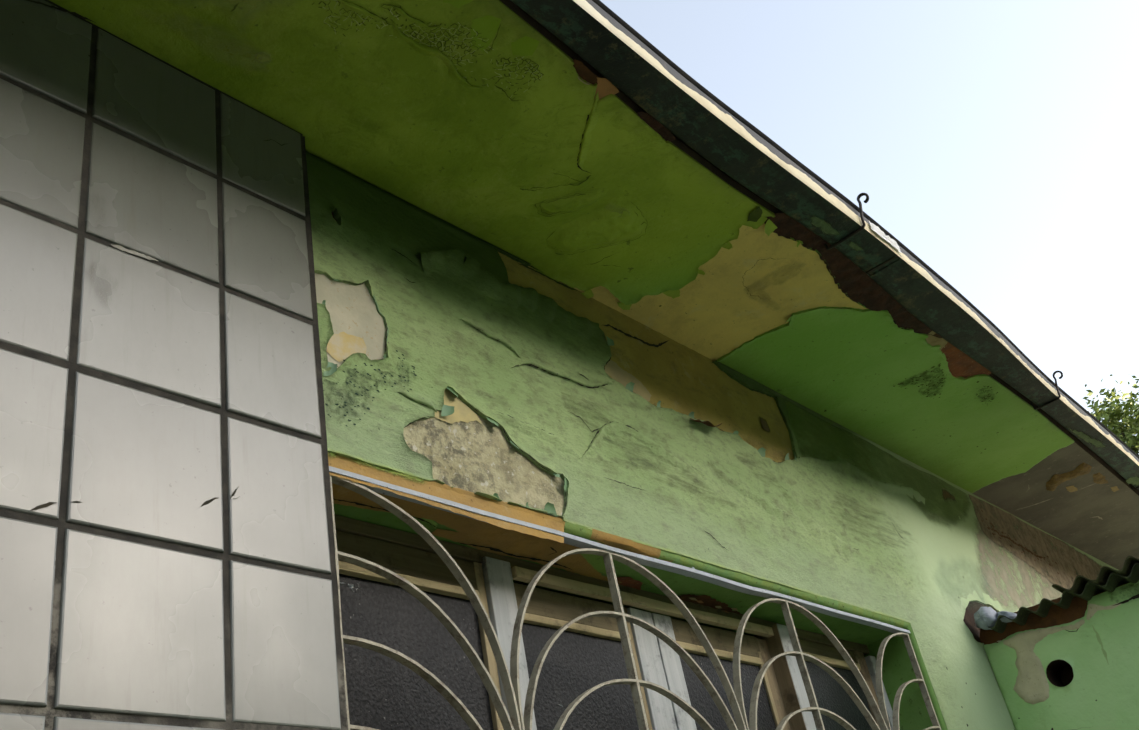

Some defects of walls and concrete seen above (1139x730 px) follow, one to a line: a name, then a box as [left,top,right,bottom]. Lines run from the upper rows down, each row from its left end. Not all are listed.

crack [520,92,647,267]
peeling [315,273,389,376]
water stain [323,350,417,426]
peeling [328,387,674,590]
peeling [498,206,991,506]
flaking render [963,442,1139,645]